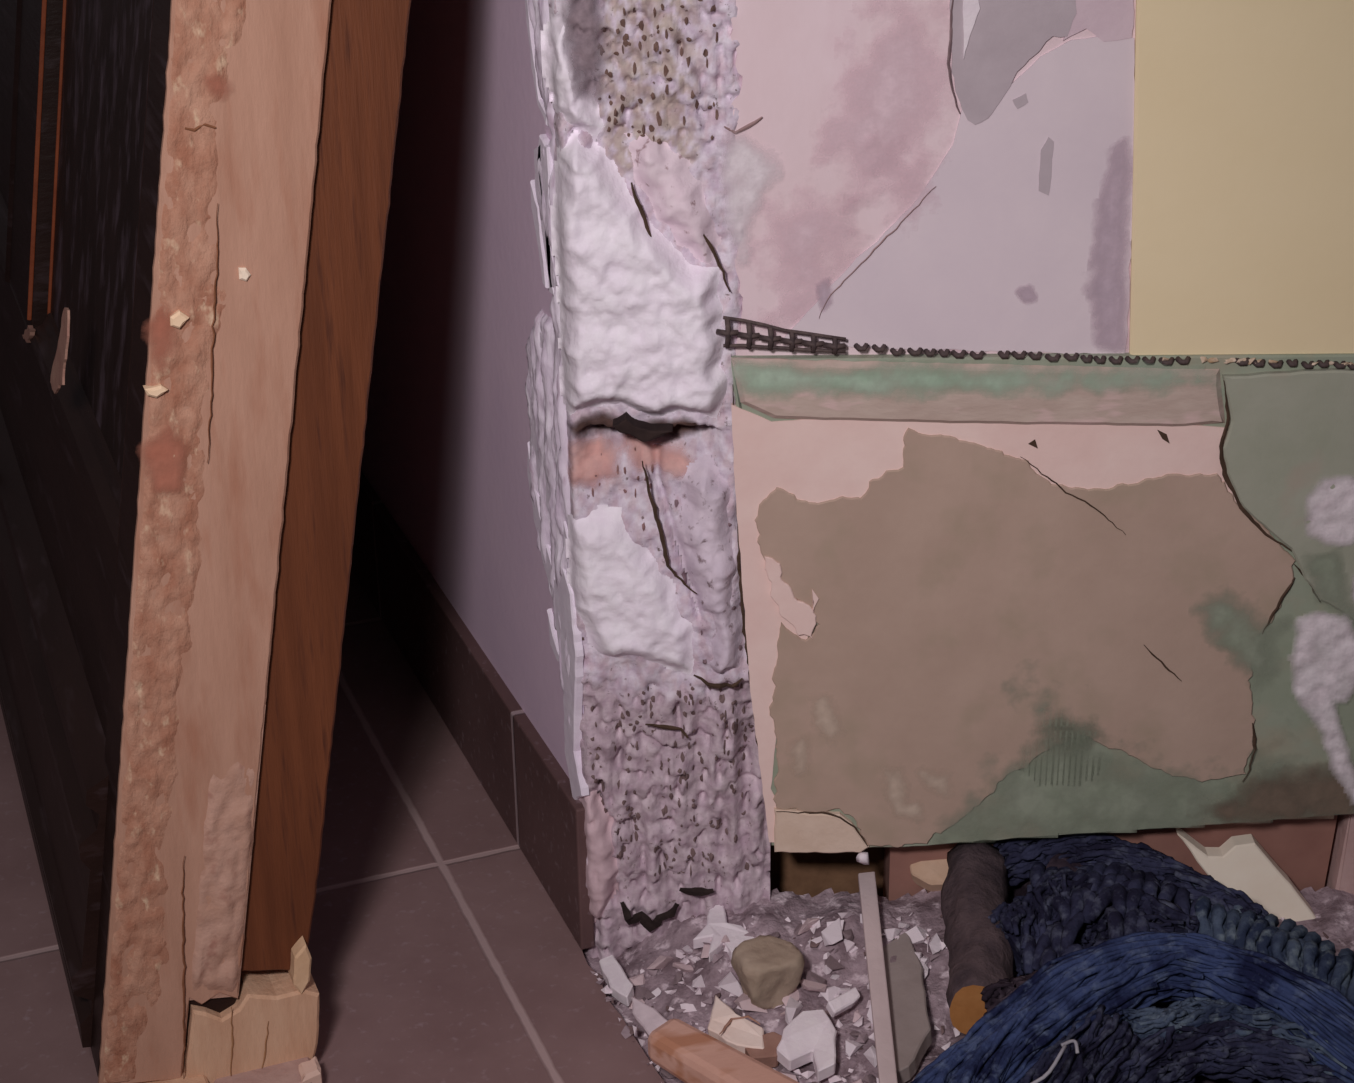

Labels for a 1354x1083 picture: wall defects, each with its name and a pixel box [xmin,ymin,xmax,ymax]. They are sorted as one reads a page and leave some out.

crack [642,461,697,594]
peeling [525,0,1354,960]
crack [1262,564,1321,634]
crack [1242,723,1257,782]